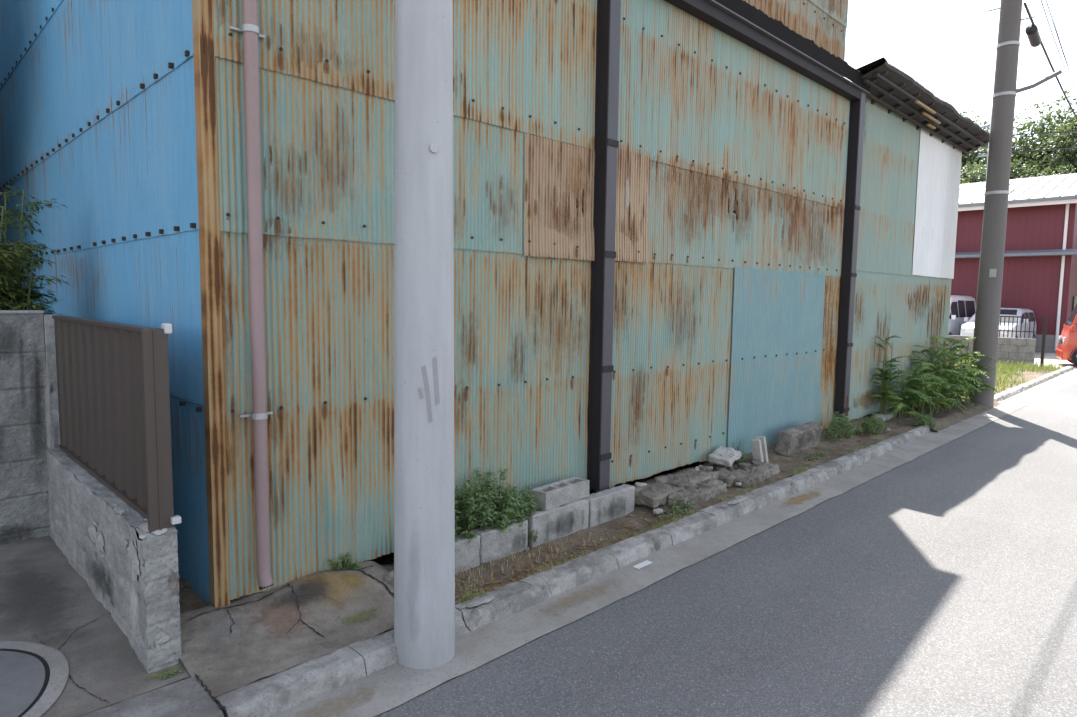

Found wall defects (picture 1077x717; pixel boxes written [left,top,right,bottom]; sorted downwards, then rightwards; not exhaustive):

corrosion [267,26,284,66]
corrosion [264,107,355,185]
corrosion [265,220,291,245]
corrosion [554,189,584,229]
corrosion [526,284,591,341]
corrosion [908,286,946,334]
crack [338,565,394,597]
crack [188,583,337,637]